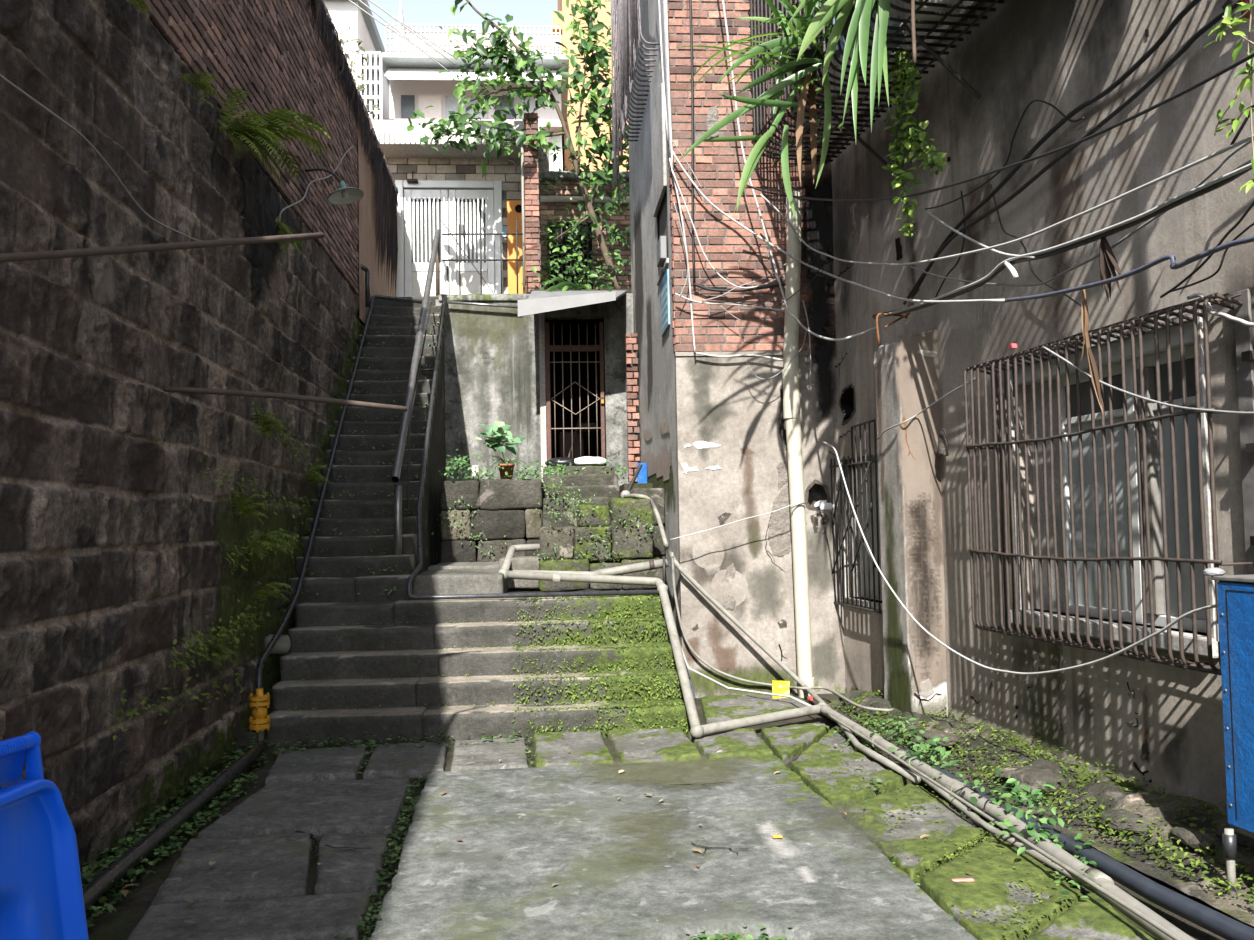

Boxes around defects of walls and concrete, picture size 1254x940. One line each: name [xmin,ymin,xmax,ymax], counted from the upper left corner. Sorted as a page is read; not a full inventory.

water stain [836,126,918,350]
water stain [692,362,729,454]
water stain [812,332,836,419]
spalling [839,383,856,425]
water stain [746,492,758,554]
water stain [888,328,947,717]
water stain [691,553,744,583]